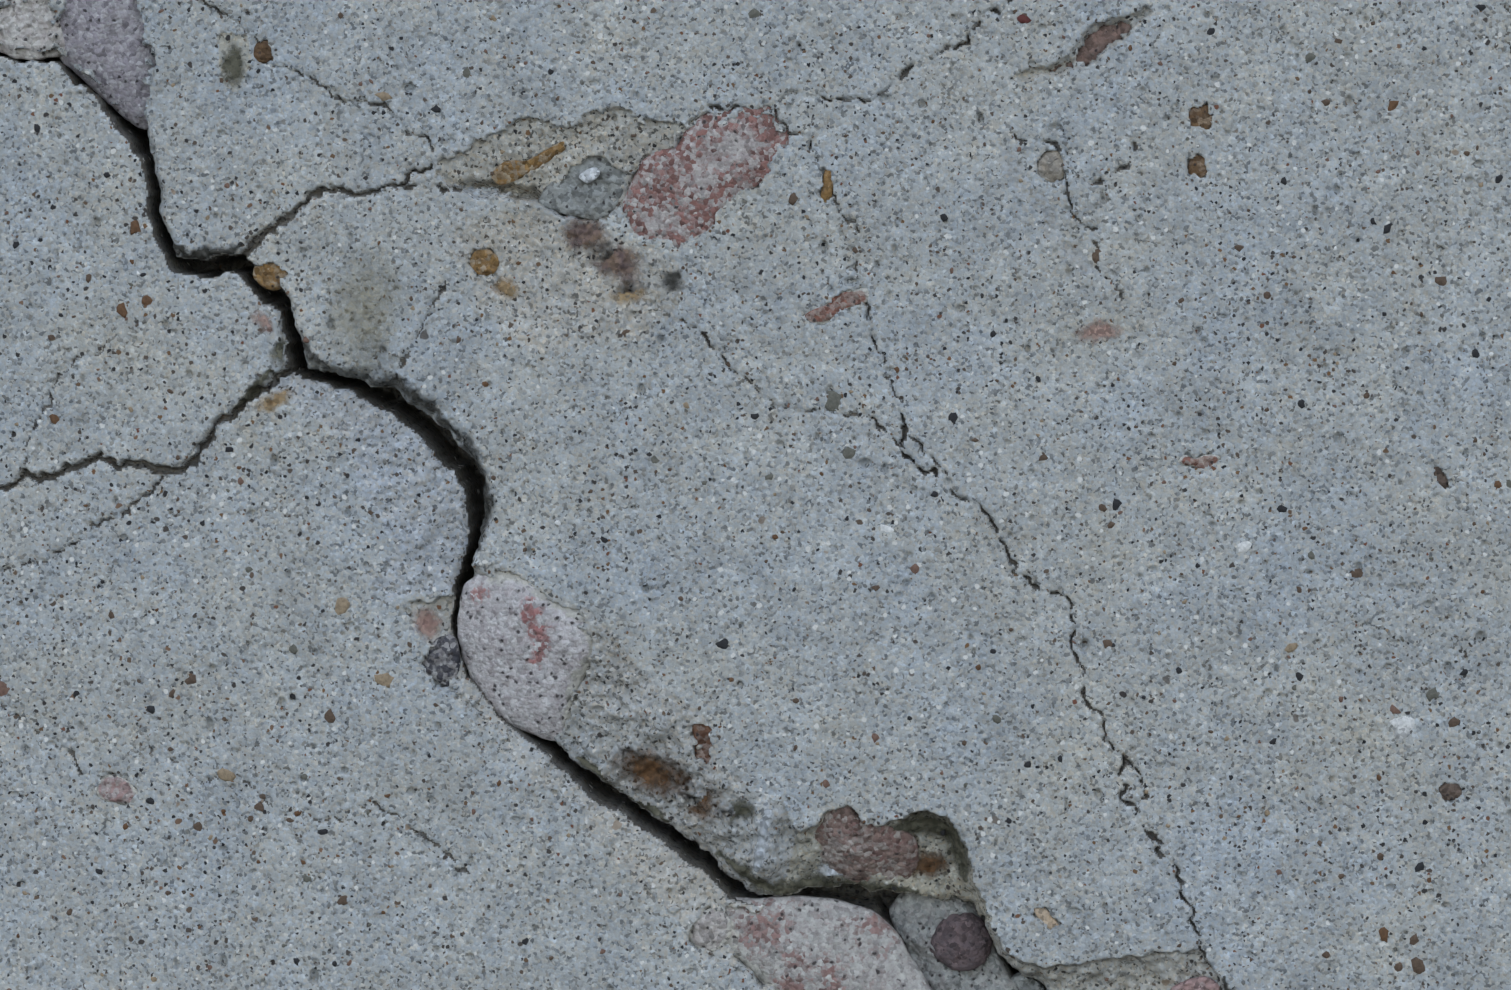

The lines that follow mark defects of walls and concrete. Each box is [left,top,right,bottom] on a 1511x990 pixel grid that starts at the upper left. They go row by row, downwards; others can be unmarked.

crack [0,0,1047,990]
spalling [436,106,696,354]
spalling [274,372,1225,990]
crack [681,0,1223,990]
crack [1484,5,1511,111]